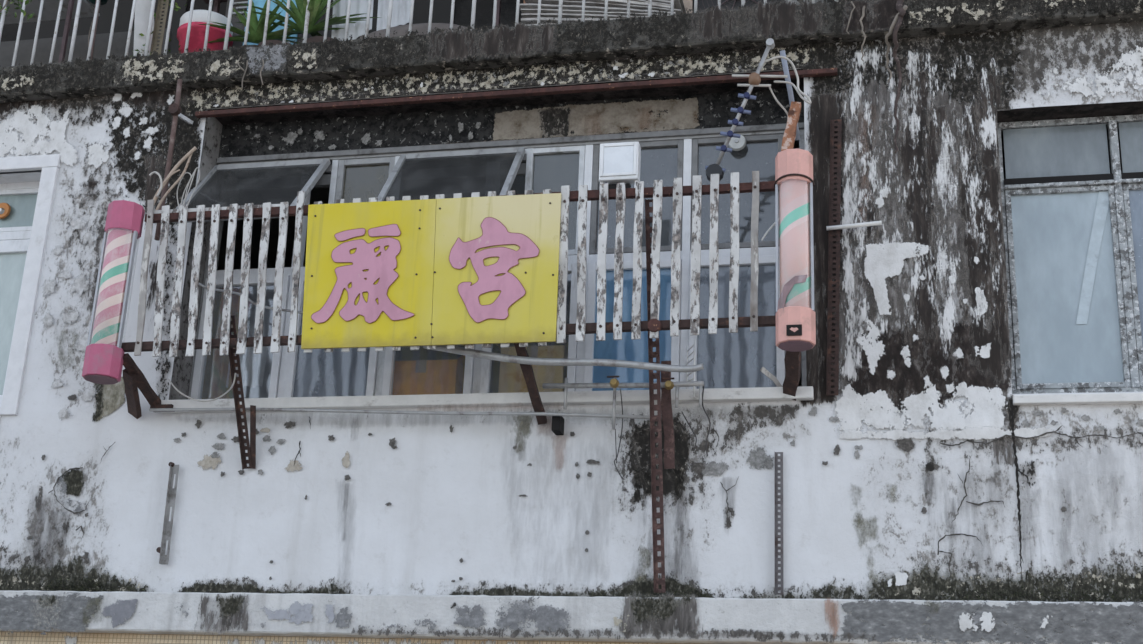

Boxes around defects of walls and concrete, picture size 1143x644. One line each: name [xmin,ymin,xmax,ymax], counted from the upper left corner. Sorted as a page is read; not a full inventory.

peeling [0,105,111,169]
peeling [112,93,159,161]
peeling [841,47,924,149]
leakage [0,0,1143,512]
peeling [808,134,1143,486]
spalling [55,469,89,517]
crack [937,400,1143,579]
leakage [0,516,154,592]
peeling [451,596,571,633]
leakage [195,549,876,644]
rust [825,599,838,635]
leakage [858,549,1143,602]